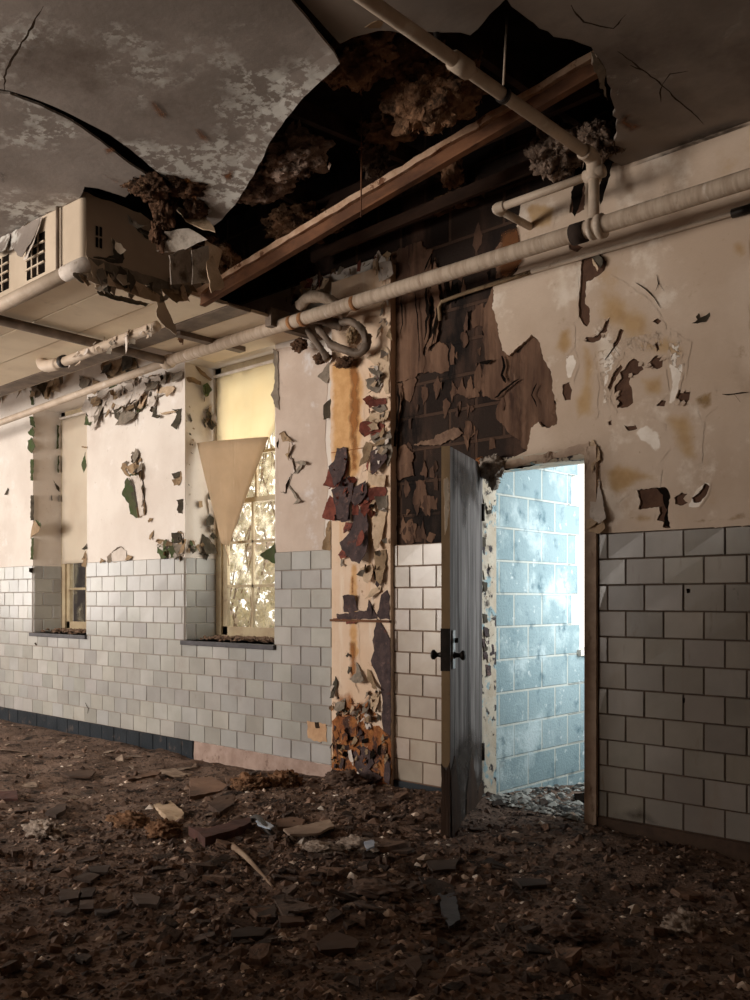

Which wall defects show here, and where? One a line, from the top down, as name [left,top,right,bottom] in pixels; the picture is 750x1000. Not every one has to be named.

crack [3,7,43,91]
crack [619,52,702,122]
spalling [283,205,521,306]
peeling [16,238,217,486]
corrosion [329,357,366,484]
spalling [260,266,607,624]
spalling [609,344,666,408]
peeling [29,495,41,573]
peeling [121,449,217,560]
spalling [638,484,709,528]
peeling [329,653,381,724]
corrosion [330,561,393,786]